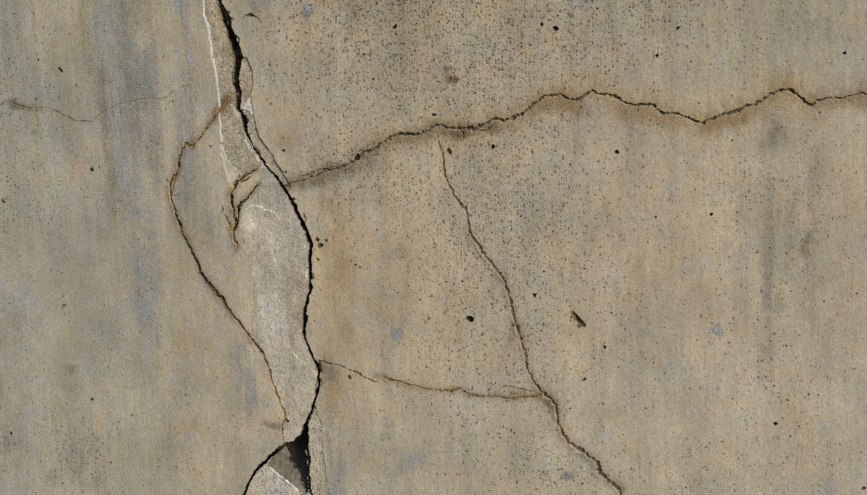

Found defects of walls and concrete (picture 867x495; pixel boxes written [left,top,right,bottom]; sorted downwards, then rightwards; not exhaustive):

crack [0,85,192,134]
crack [168,95,288,495]
spalling [202,0,330,495]
crack [305,443,313,495]
crack [383,133,622,495]
crack [215,0,867,428]